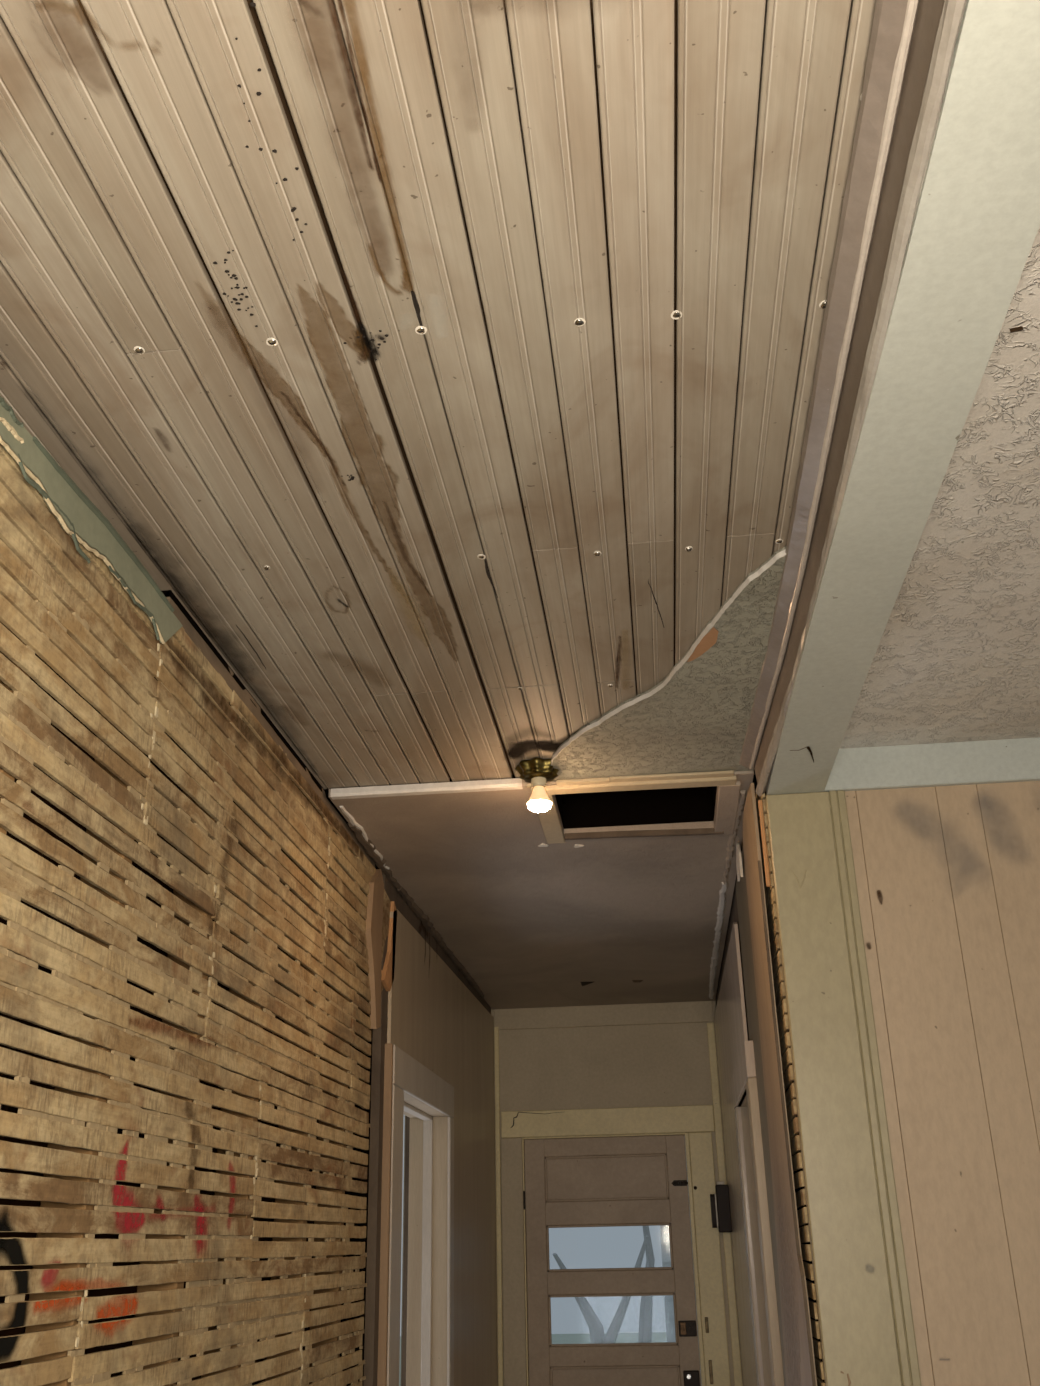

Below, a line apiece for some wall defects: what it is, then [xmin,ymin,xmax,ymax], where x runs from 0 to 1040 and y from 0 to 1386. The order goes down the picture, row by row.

water stain [328,0,413,293]
peeling [0,403,183,644]
water stain [250,285,457,661]
peeling [687,627,719,662]